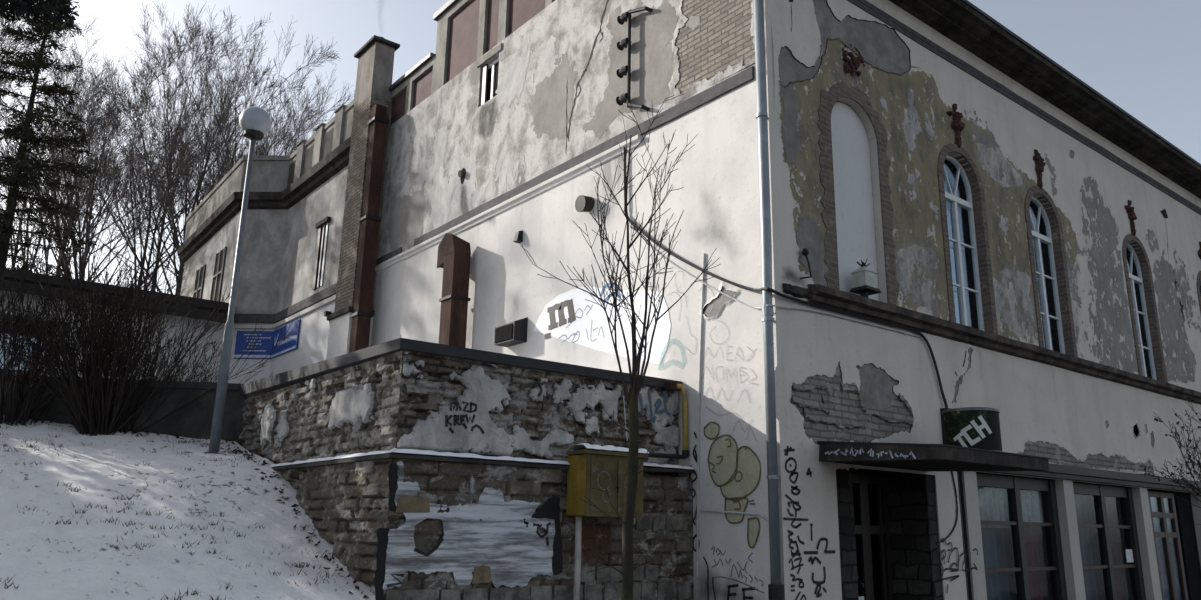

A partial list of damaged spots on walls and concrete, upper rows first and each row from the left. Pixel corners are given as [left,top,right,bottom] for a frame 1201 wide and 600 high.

crack [566,0,608,143]
flaking render [529,0,756,140]
peeling [386,189,426,251]
peeling [771,0,1138,373]
peeling [305,378,318,392]
peeling [328,383,378,433]
peeling [400,351,425,384]
spalling [700,281,741,322]
spalling [775,333,926,470]
peeling [1145,229,1201,387]
peeling [383,364,679,590]